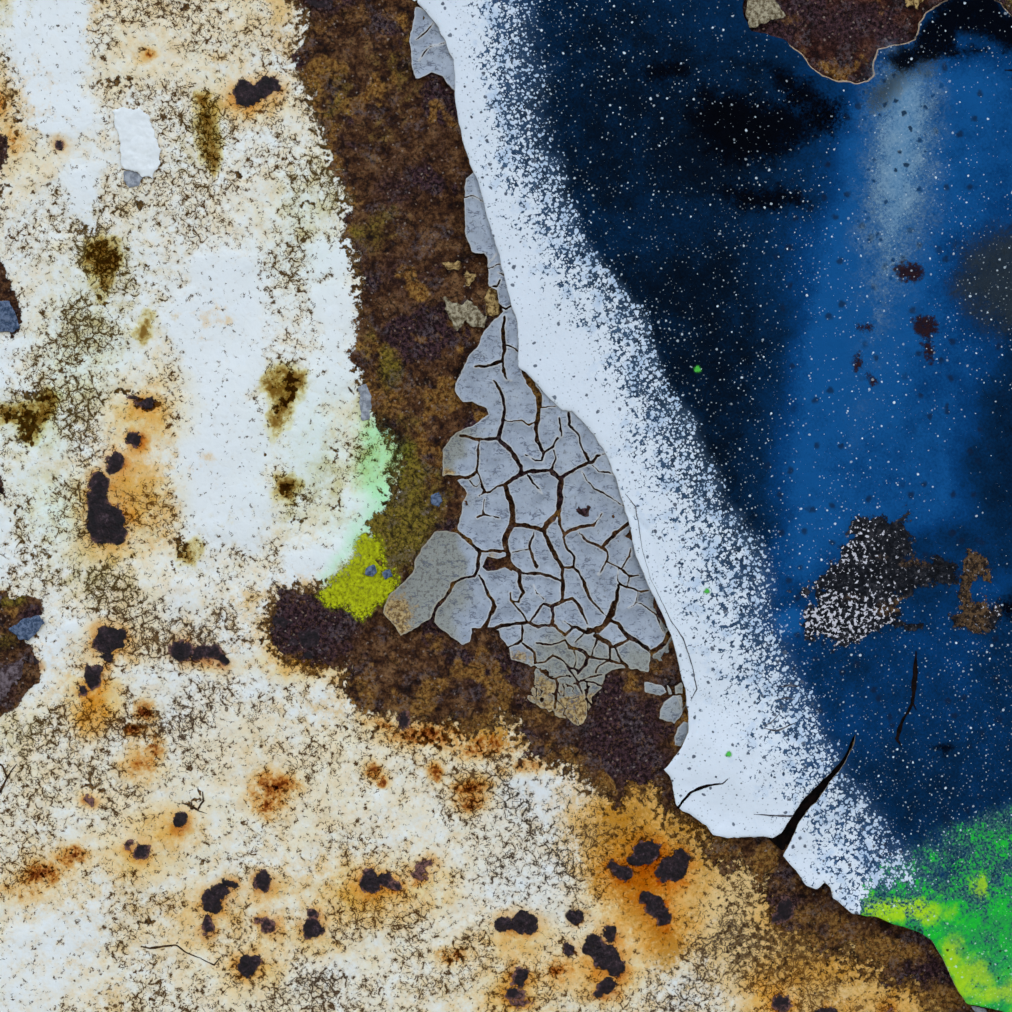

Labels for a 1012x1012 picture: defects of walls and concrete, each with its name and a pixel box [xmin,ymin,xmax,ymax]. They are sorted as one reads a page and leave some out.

peeling [409,0,455,91]
peeling [745,0,785,28]
rust [85,432,143,545]
peeling [365,173,688,746]
rust [268,0,1003,1012]
rust [0,590,48,717]
rust [76,626,127,698]
crack [625,494,697,701]
spalling [787,505,1003,654]
crack [895,652,918,747]
crack [754,735,855,850]
rust [201,878,240,937]